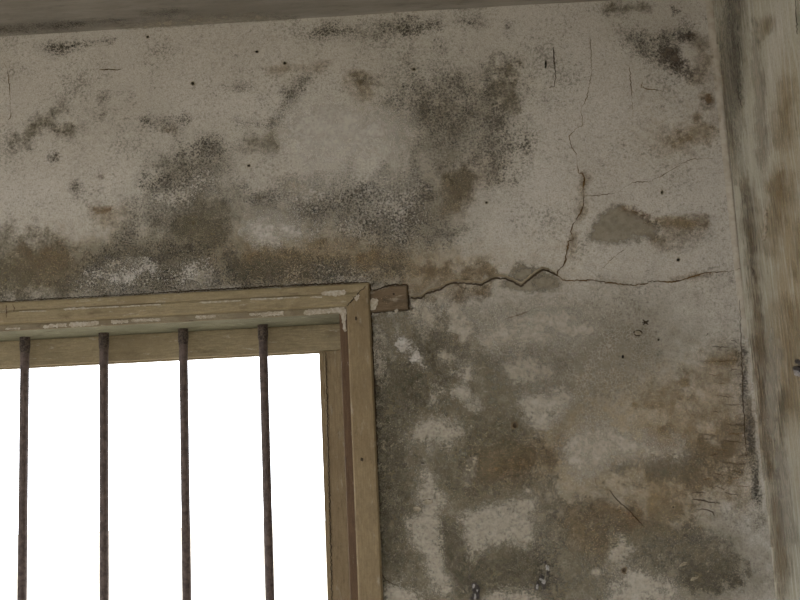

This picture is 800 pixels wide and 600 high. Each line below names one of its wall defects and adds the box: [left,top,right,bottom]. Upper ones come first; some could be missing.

leakage [0,61,521,300]
leakage [503,263,560,293]
crack [410,32,754,299]
leakage [589,205,708,247]
leakage [626,23,718,83]
leakage [372,291,751,600]